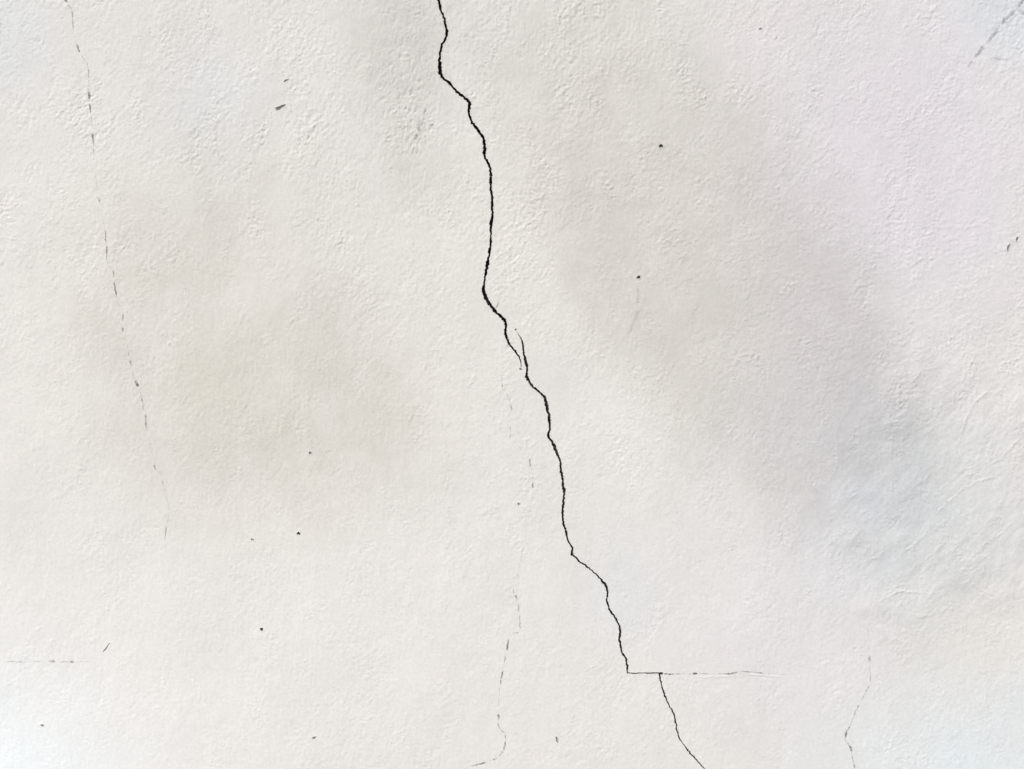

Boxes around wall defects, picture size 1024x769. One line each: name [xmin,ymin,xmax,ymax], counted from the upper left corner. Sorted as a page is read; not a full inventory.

crack [436,0,707,769]